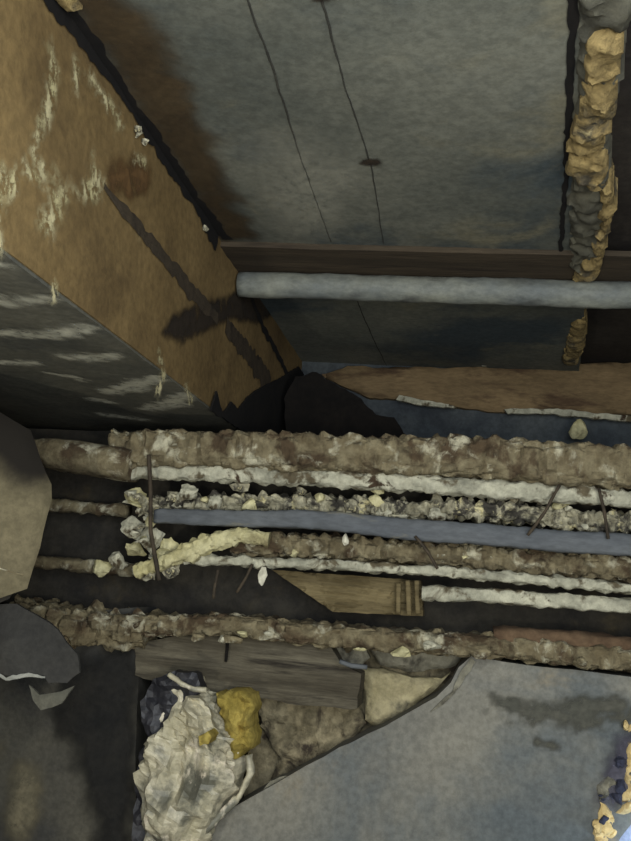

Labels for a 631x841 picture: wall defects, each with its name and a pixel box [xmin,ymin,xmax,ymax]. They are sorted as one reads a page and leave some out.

spalling [56,0,83,12]
leakage [0,165,16,201]
leakage [25,51,68,232]
crack [44,0,233,251]
spalling [565,0,631,282]
flaking render [592,720,631,841]